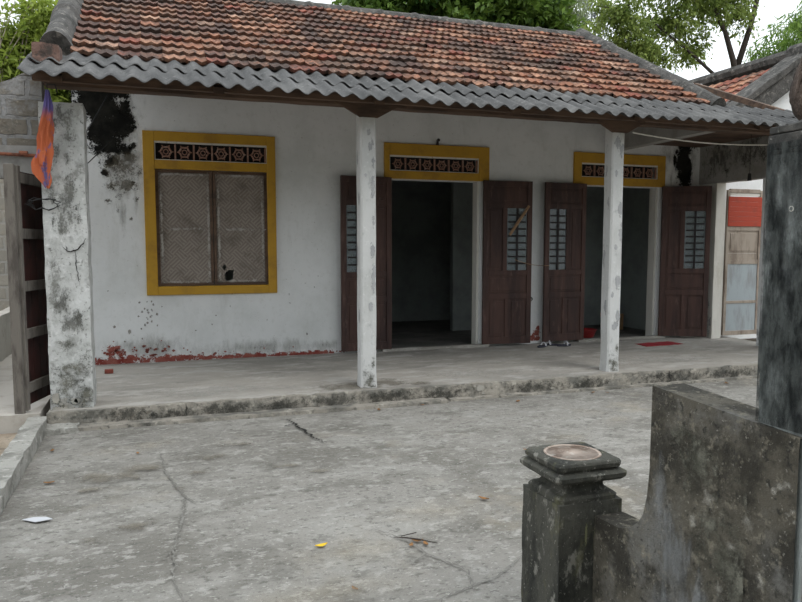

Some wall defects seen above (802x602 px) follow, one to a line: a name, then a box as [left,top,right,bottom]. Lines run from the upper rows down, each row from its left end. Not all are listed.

damp [53,90,141,212]
damp [49,174,81,234]
crack [63,238,86,285]
damp [48,263,84,334]
peeling [95,301,341,365]
crack [284,419,323,442]
crack [159,451,198,602]
damp [712,543,744,602]